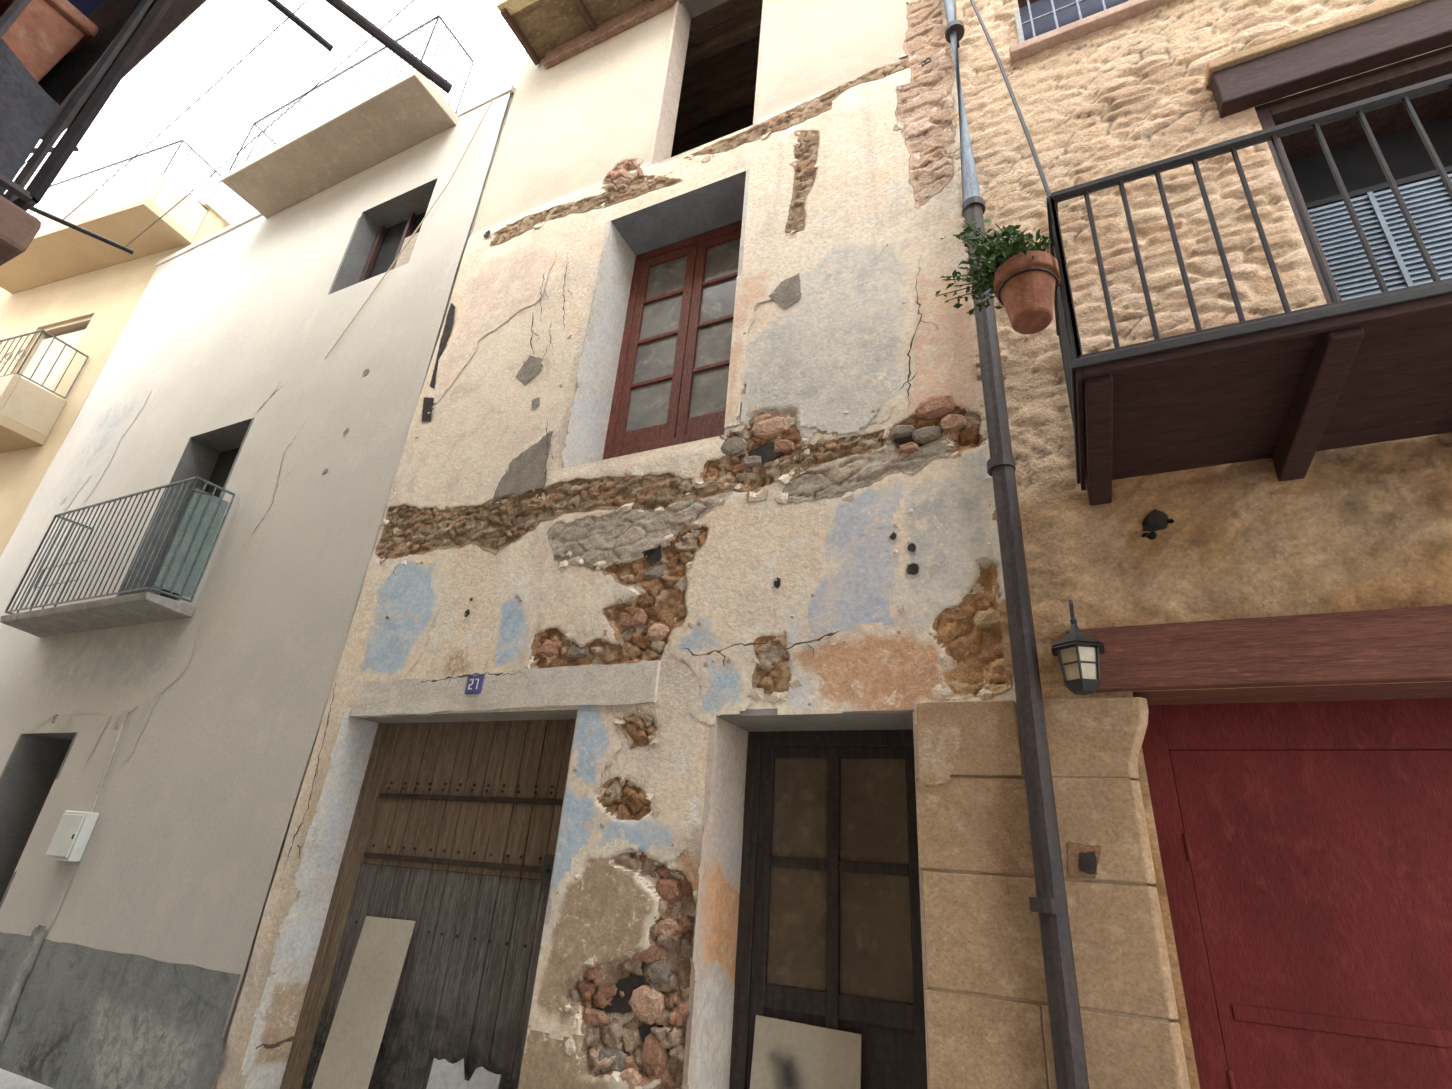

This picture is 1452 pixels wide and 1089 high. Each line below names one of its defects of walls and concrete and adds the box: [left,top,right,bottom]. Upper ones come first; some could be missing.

flaking render [893,0,960,208]
flaking render [601,158,658,193]
flaking render [785,129,820,233]
flaking render [523,257,988,669]
crack [684,630,840,665]
flaking render [750,615,802,704]
flaking render [928,542,1012,701]
flaking render [614,709,661,749]
flaking render [524,774,698,1089]